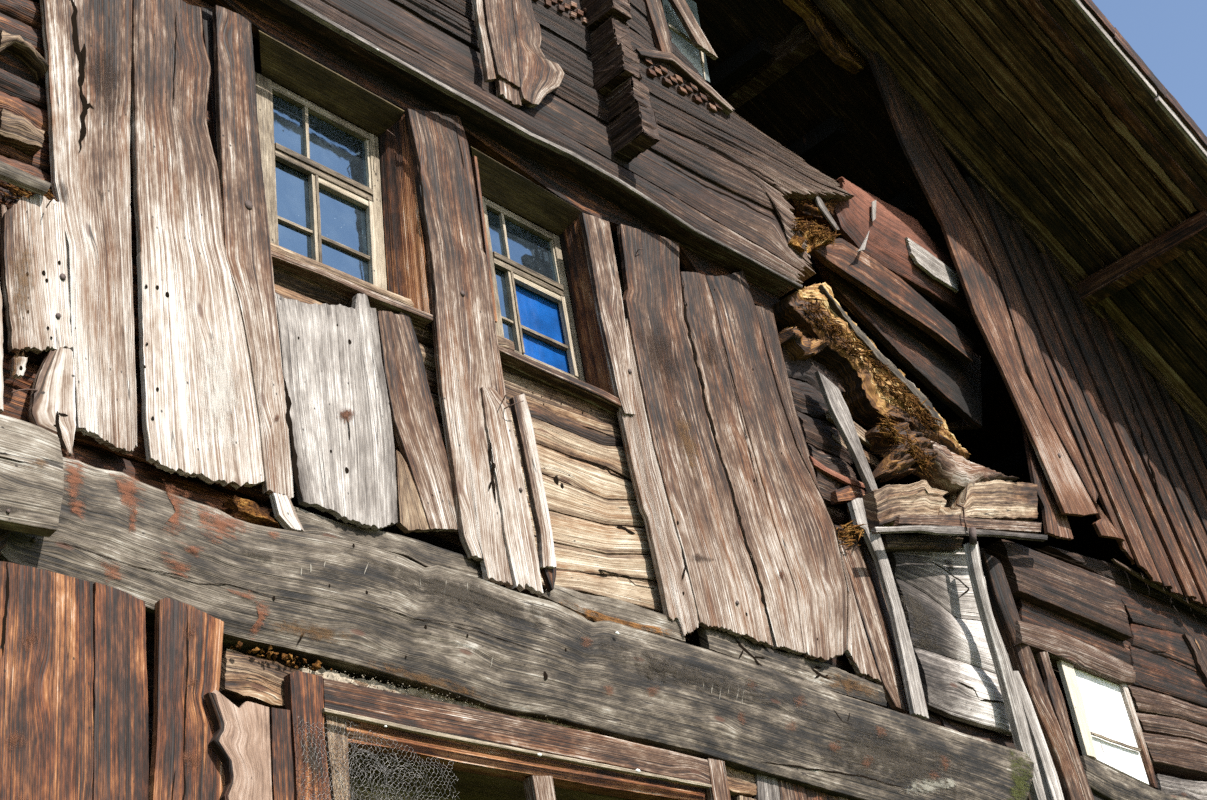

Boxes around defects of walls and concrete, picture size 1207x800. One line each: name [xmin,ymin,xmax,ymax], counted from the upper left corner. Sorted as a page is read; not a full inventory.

crack [71,0,94,153]
peeling [947,418,975,431]
rust [66,463,85,517]
rust [110,474,139,530]
crack [488,442,496,503]
crack [931,561,969,597]